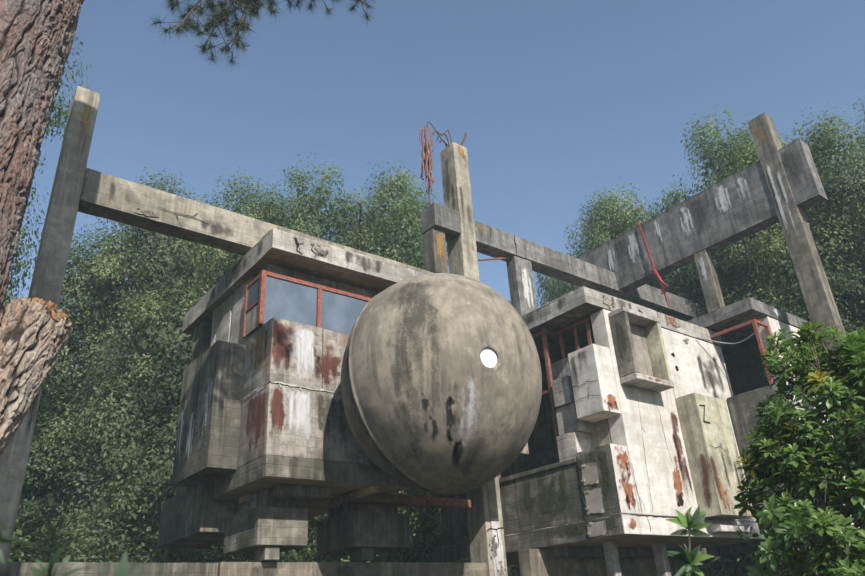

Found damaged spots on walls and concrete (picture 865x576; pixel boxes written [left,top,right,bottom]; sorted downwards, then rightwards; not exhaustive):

corrosion [419,126,434,206]
leakage [680,178,750,235]
leakage [767,151,799,230]
leakage [608,234,639,270]
corrosion [272,321,292,370]
corrosion [313,346,341,383]
corrosion [247,388,285,452]
leakage [449,380,485,473]
corrosion [608,394,619,410]
corrosion [617,451,636,529]
corrosion [671,413,693,503]
corrosion [700,454,747,512]